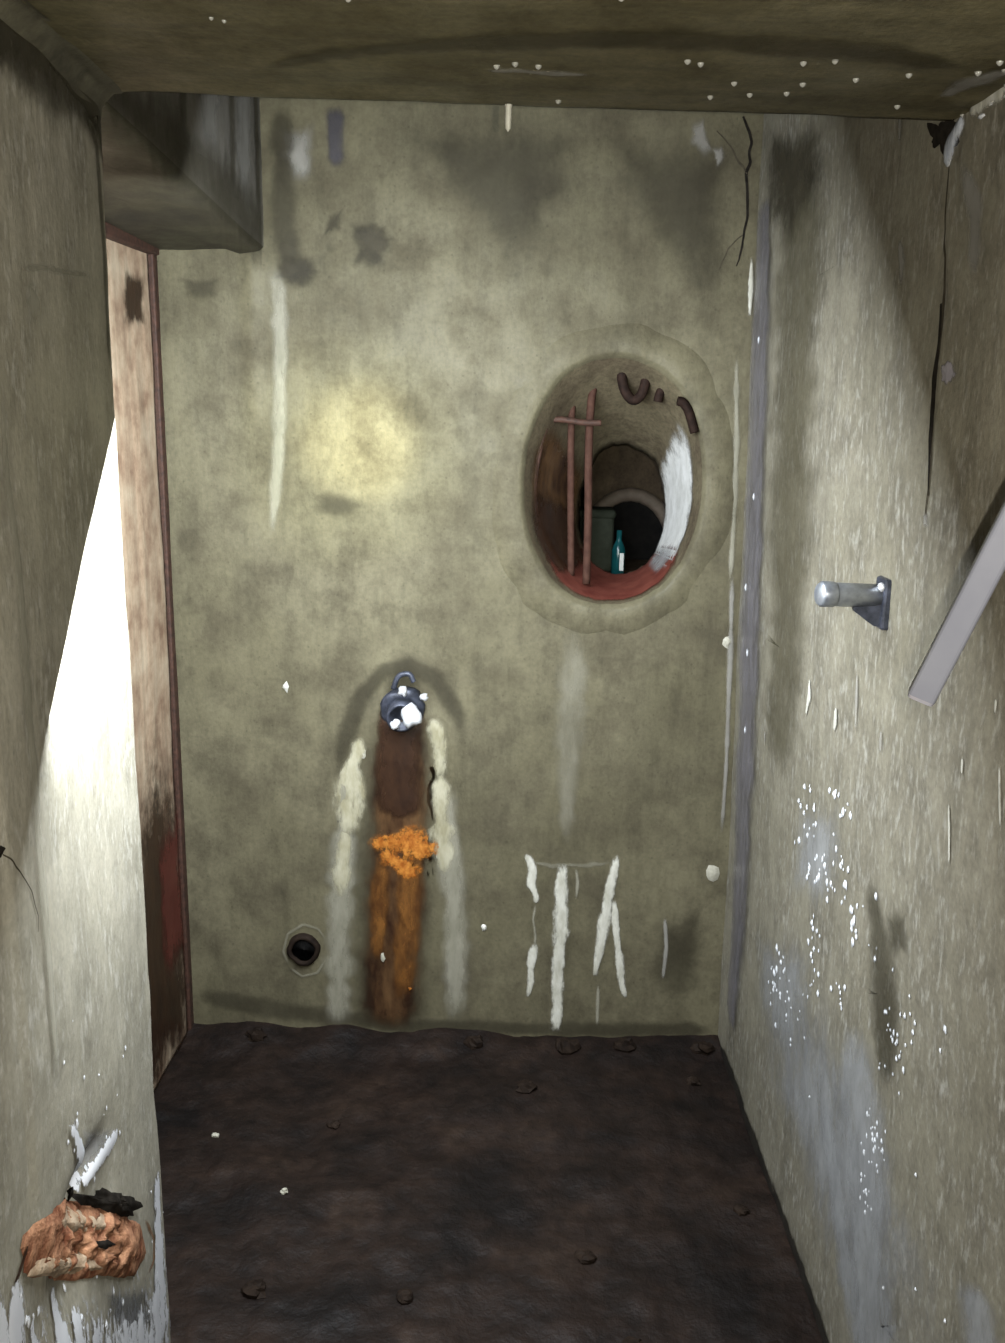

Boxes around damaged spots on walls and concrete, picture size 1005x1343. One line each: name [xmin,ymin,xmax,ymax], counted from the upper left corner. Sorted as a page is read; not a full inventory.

crack [717,116,753,271]
leakage [271,295,285,516]
crack [924,167,955,524]
rust [339,660,461,756]
rust [365,719,439,1023]
leakage [211,721,699,1035]
leakage [727,137,817,1029]
leakage [800,824,829,887]
spalling [0,1112,171,1343]
leakage [719,1045,829,1343]
leakage [786,898,902,1343]